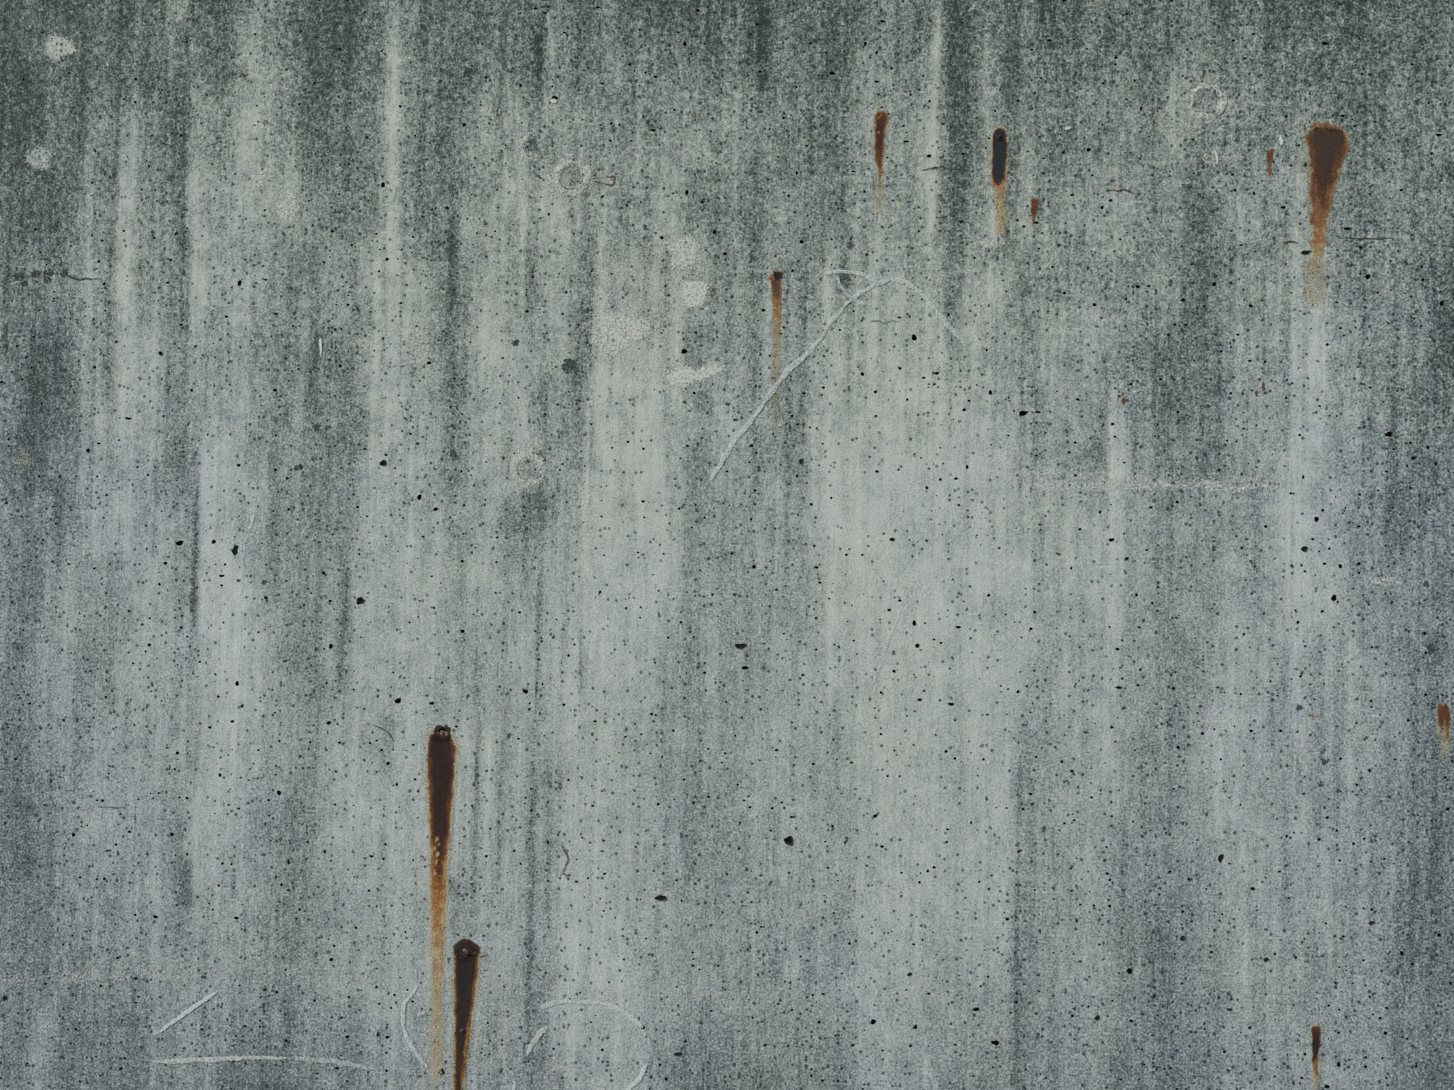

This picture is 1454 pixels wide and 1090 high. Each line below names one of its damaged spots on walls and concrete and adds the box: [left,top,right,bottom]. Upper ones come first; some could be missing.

rust [873,109,889,208]
rust [989,126,1010,235]
rust [1303,121,1350,304]
damp [561,348,591,374]
rust [767,271,783,416]
rust [1436,704,1451,758]
rust [423,724,488,1090]
rust [1311,1024,1322,1089]